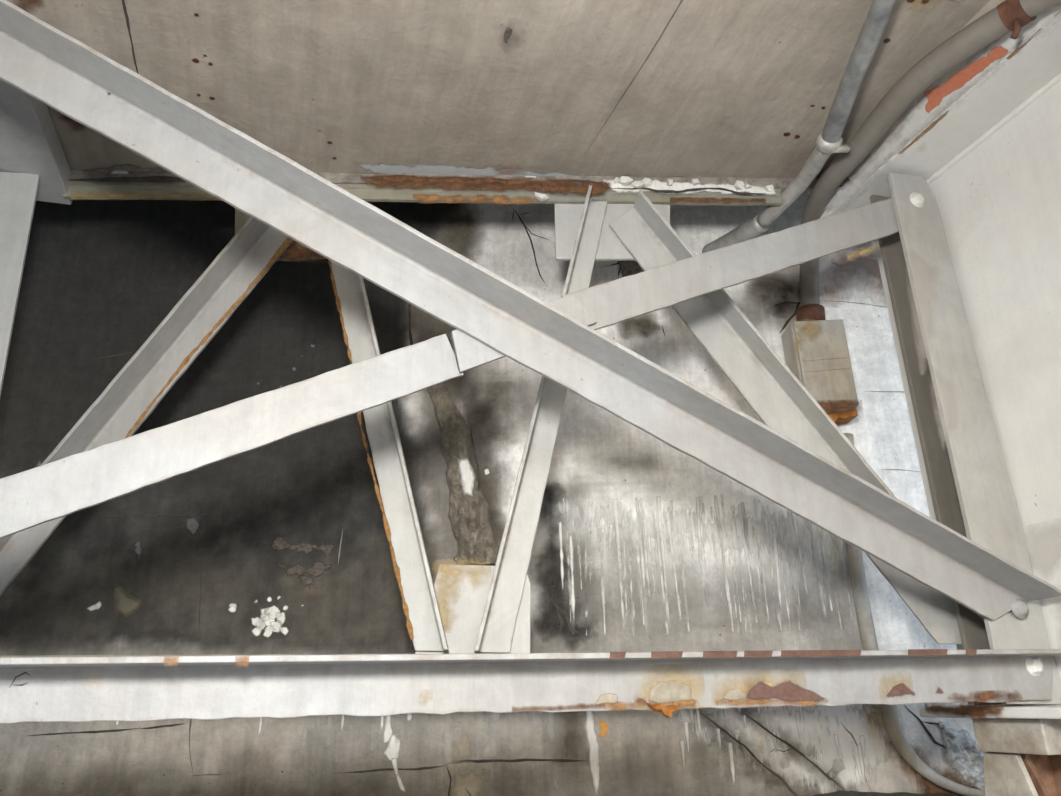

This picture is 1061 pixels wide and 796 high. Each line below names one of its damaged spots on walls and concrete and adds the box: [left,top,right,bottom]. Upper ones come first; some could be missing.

crack [122,0,138,73]
rust [374,174,607,204]
leakage [544,489,564,504]
spalling [256,537,336,586]
leakage [536,494,854,642]
rust [703,650,861,658]
rust [735,679,824,702]
rust [887,683,915,697]
rust [937,688,1019,702]
spalling [939,722,985,791]
crack [335,758,583,796]